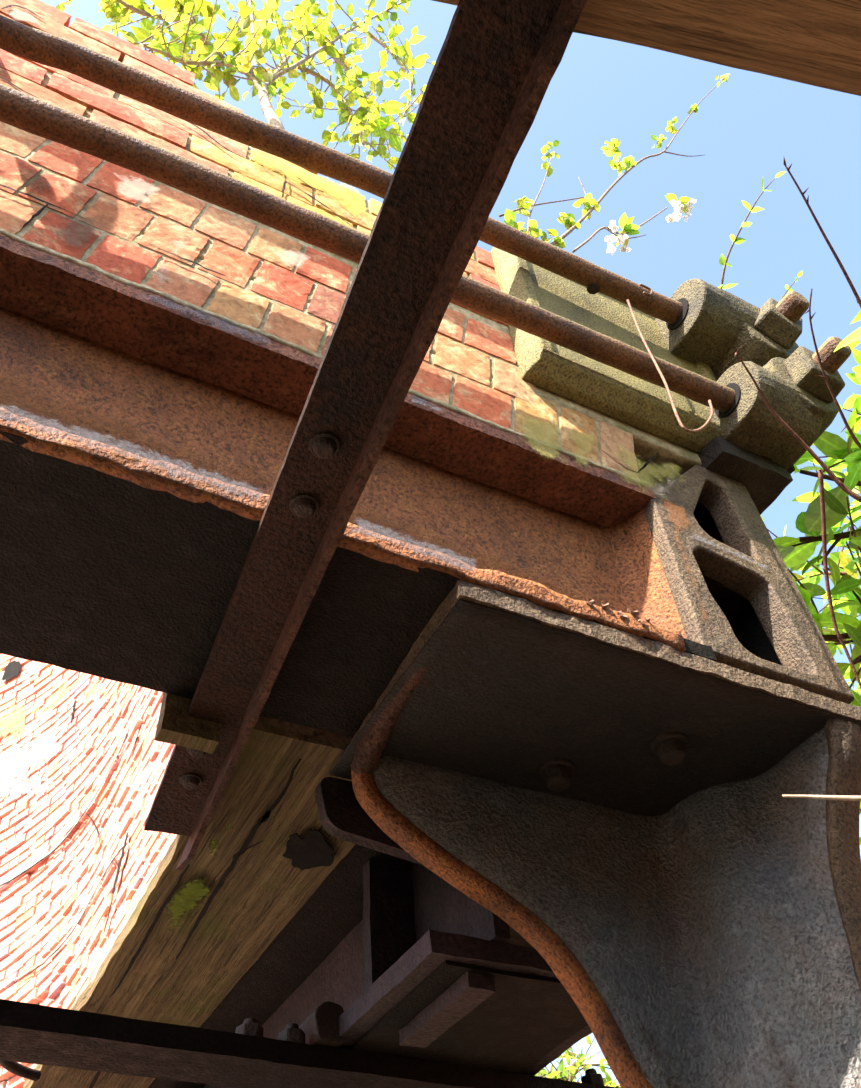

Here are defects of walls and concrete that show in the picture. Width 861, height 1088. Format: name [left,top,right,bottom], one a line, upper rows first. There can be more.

corrosion [585,599,651,627]
spalling [2,660,21,681]